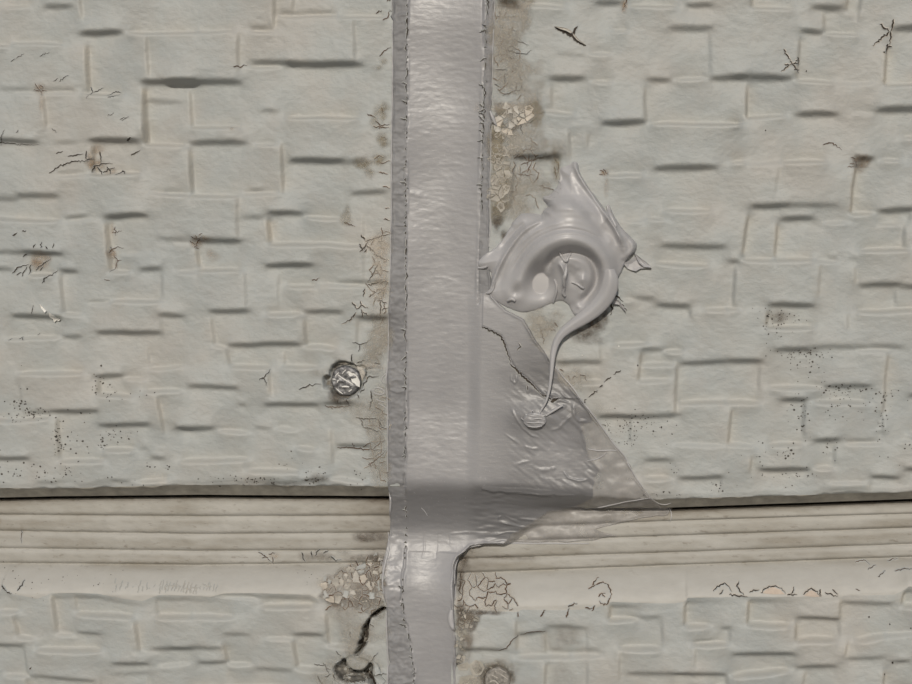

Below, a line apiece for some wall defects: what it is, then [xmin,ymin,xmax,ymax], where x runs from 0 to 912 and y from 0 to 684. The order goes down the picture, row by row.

crack [375,0,391,21]
crack [299,107,391,482]
leakage [763,305,899,442]
leakage [1,400,138,483]
crack [301,549,387,684]
peeling [713,580,839,598]